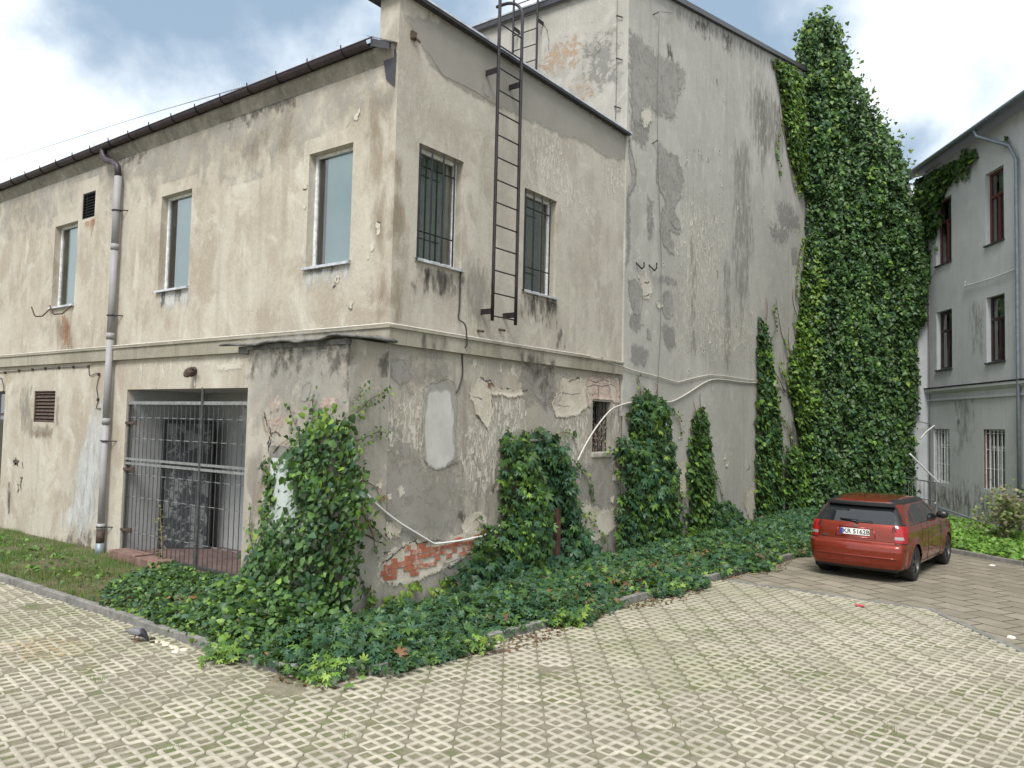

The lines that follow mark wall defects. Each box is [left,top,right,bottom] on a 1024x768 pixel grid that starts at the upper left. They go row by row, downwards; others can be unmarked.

flaking render [584,28,699,254]
water stain [426,269,454,295]
flaking render [628,271,677,366]
flaking render [469,377,527,431]
flaking render [551,376,620,418]
flaking render [356,512,487,590]